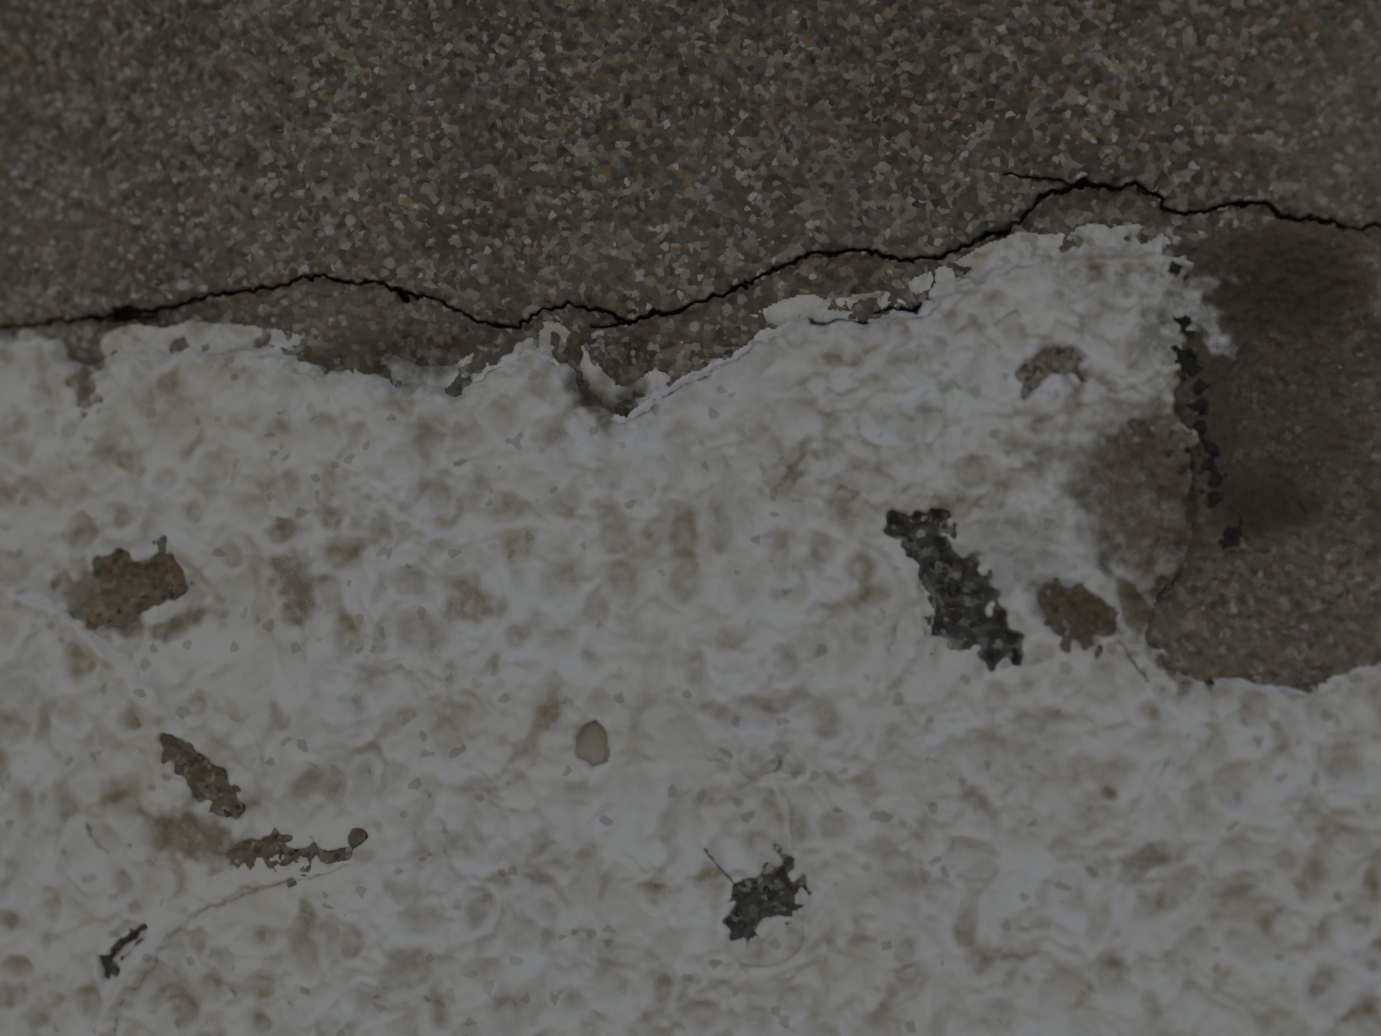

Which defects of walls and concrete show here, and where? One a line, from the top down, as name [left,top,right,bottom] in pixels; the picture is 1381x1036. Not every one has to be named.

crack [0,172,1381,330]
peeling [609,257,1050,424]
spalling [1015,347,1084,400]
spalling [1117,217,1381,696]
spalling [69,535,194,630]
spalling [883,508,1024,672]
spalling [1038,577,1119,658]
spalling [160,733,244,819]
spalling [226,828,368,888]
hole [100,924,147,979]
hole [722,844,812,968]